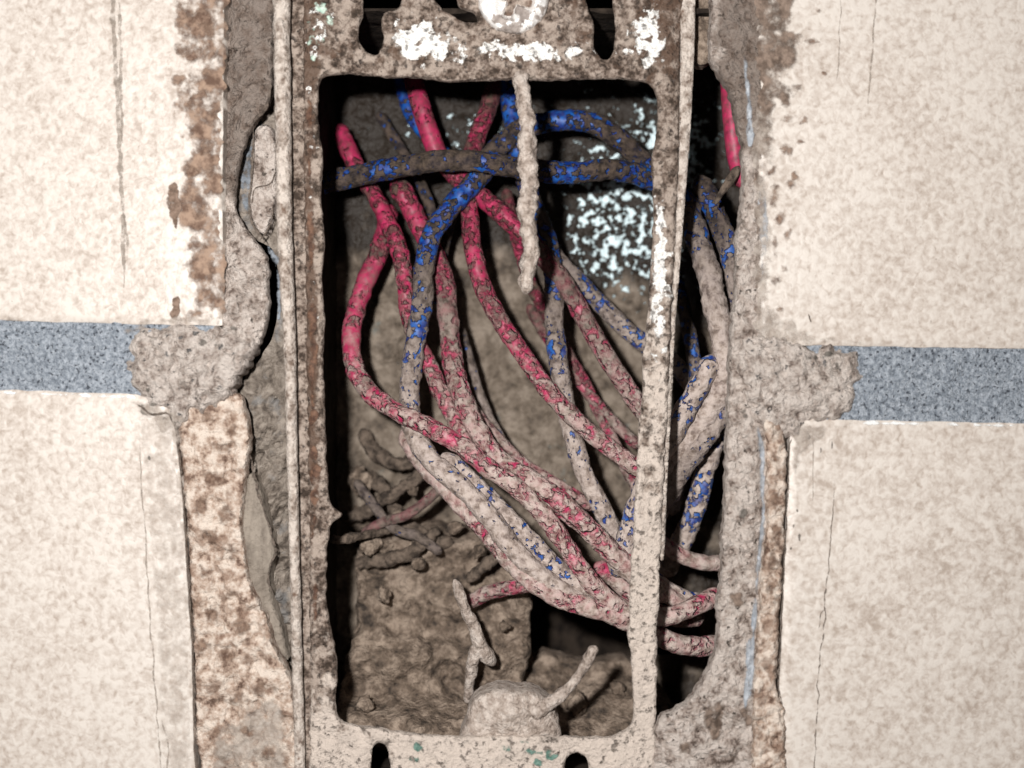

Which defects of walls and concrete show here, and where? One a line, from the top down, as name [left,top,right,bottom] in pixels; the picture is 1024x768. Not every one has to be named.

spalling [363,0,402,8]
spalling [435,0,459,8]
spalling [586,0,613,8]
spalling [167,0,230,319]
peeling [250,124,277,236]
spalling [271,257,279,340]
peeling [204,472,225,485]
crack [135,403,197,768]
peeling [205,594,231,619]
peeling [219,472,291,660]
spalling [769,525,801,569]
crack [778,436,835,768]